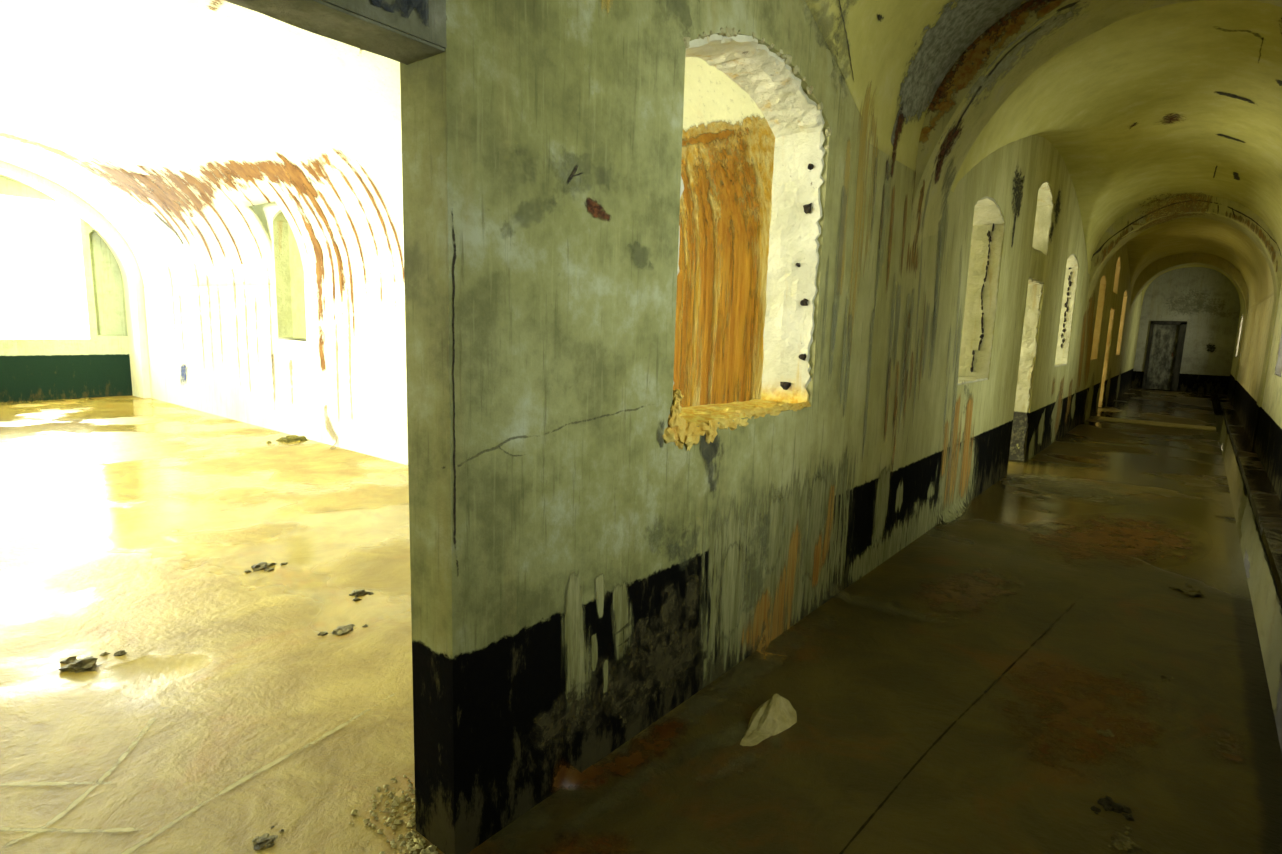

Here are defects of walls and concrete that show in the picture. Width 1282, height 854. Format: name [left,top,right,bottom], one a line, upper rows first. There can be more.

crack [839,0,854,81]
spalling [891,0,1030,144]
crack [927,0,1080,159]
crack [1215,91,1254,104]
crack [1217,18,1282,63]
corrosion [77,149,404,371]
crack [1061,134,1281,348]
corrosion [1096,193,1278,272]